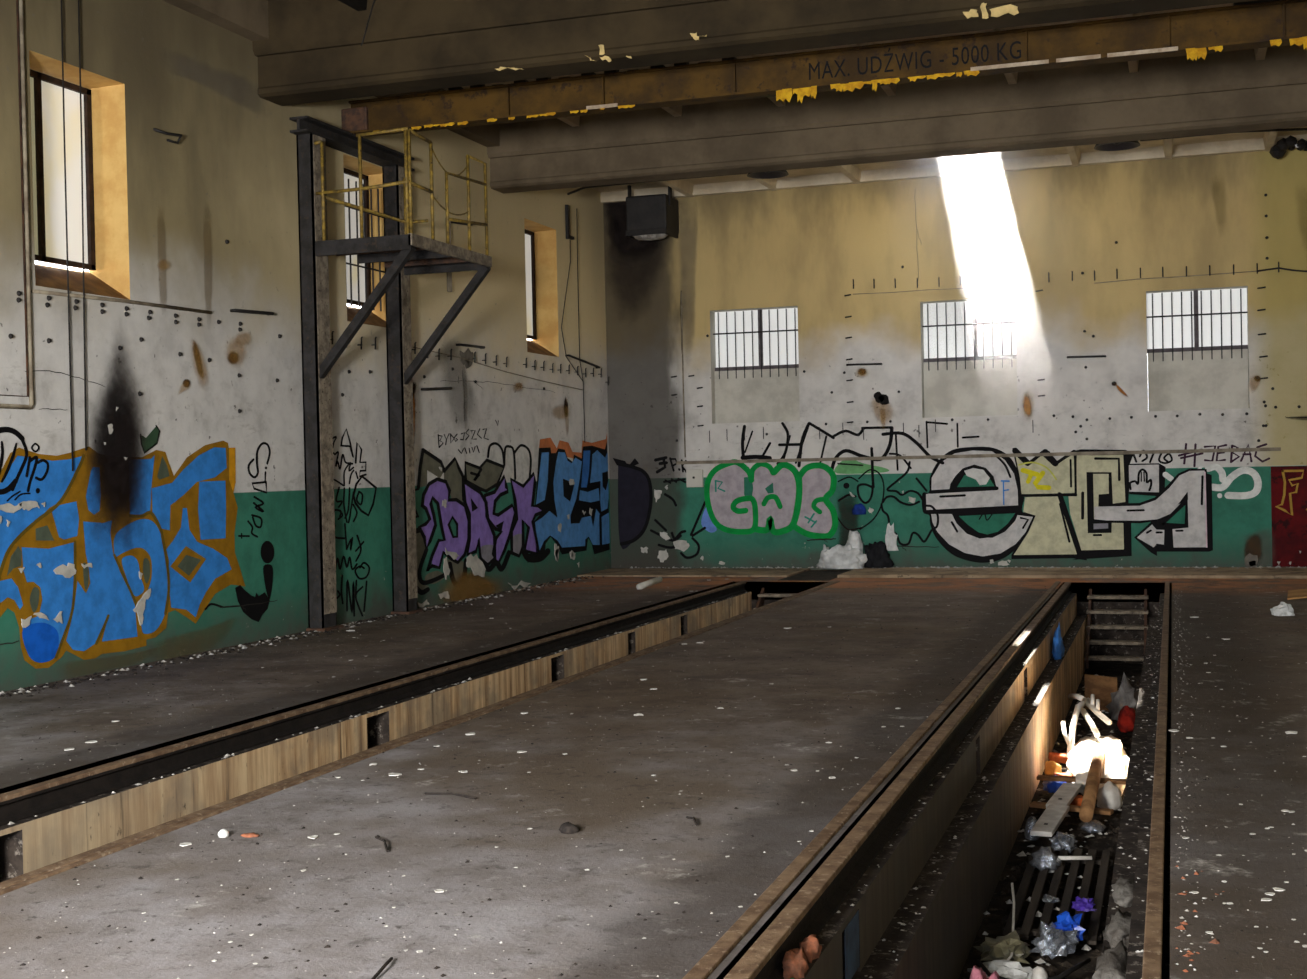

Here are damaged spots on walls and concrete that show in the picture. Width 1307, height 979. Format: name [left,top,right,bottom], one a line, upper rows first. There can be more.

peeling [963,3,1019,19]
peeling [587,45,632,62]
peeling [1186,46,1223,61]
peeling [1270,36,1307,49]
peeling [776,70,980,104]
peeling [487,105,635,122]
rust [183,342,203,387]
peeling [0,501,45,527]
peeling [641,532,725,565]
peeling [18,563,92,578]
peeling [417,548,486,607]
spalling [0,582,827,882]